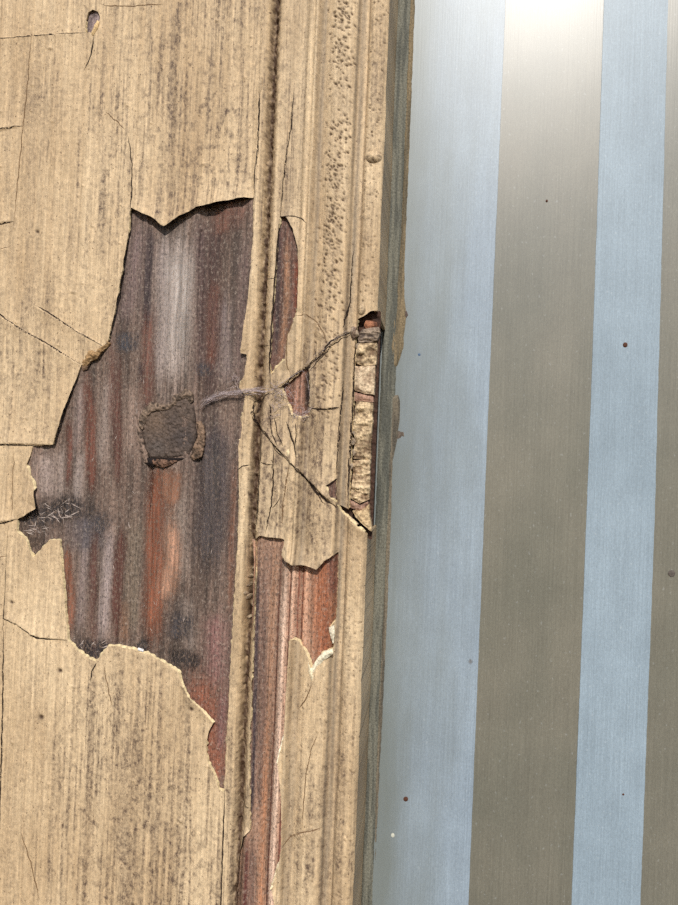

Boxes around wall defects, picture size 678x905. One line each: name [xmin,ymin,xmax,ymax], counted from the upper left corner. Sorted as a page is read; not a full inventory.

peeling [87,10,100,36]
crack [0,33,64,249]
crack [106,112,133,207]
crack [0,314,78,363]
crack [35,305,102,346]
crack [237,93,356,535]
peeling [326,320,381,531]
crack [0,444,67,801]
peeling [18,197,339,905]
crack [21,834,39,898]